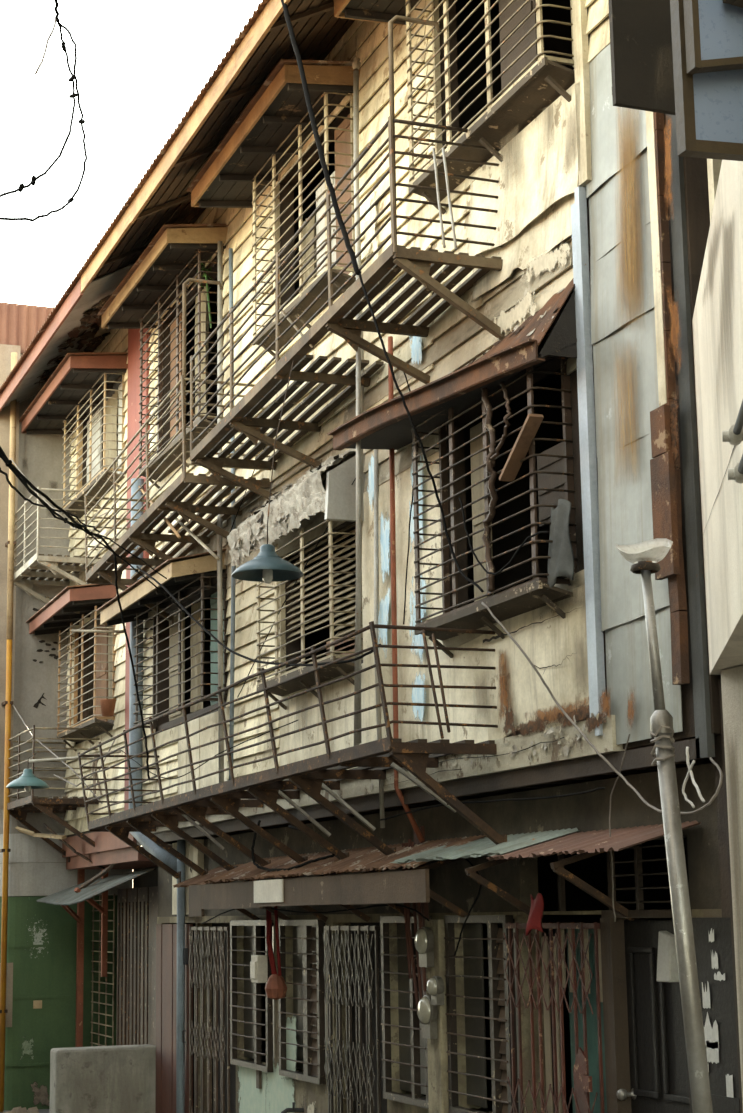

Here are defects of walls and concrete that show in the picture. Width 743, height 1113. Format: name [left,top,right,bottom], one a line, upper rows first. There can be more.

rust [619,128,640,301]
rust [617,361,636,463]
spalling [231,483,290,560]
rust [499,651,516,741]
rust [586,691,610,733]
peeling [28,918,49,958]